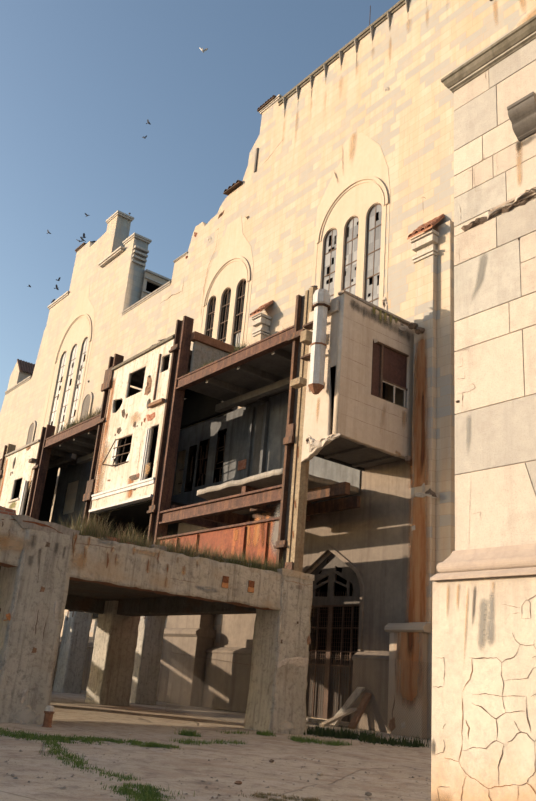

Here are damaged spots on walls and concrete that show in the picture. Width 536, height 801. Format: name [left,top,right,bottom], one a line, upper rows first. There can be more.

damp [475,255,486,292]
spalling [114,409,155,436]
rust [403,338,428,622]
rust [234,514,280,547]
damp [472,587,493,646]
rust [397,632,422,704]
crack [437,595,536,801]